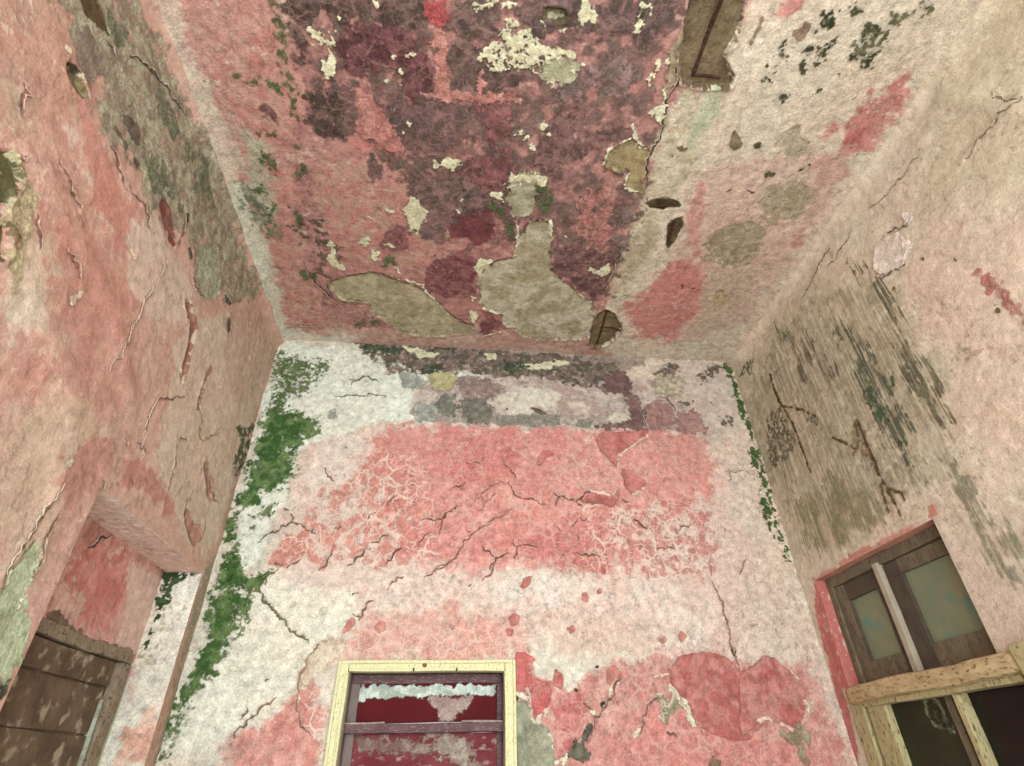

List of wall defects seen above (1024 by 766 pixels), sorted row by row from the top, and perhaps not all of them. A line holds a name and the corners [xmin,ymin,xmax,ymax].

crack [107,39,187,116]
spalling [0,149,27,262]
spalling [326,171,624,350]
damp [766,407,796,469]
damp [774,319,916,470]
damp [846,258,965,429]
crack [623,499,690,549]
damp [940,453,1024,589]
spalling [0,541,41,686]
crack [233,456,601,739]
crack [708,559,740,670]
spalling [515,652,623,766]